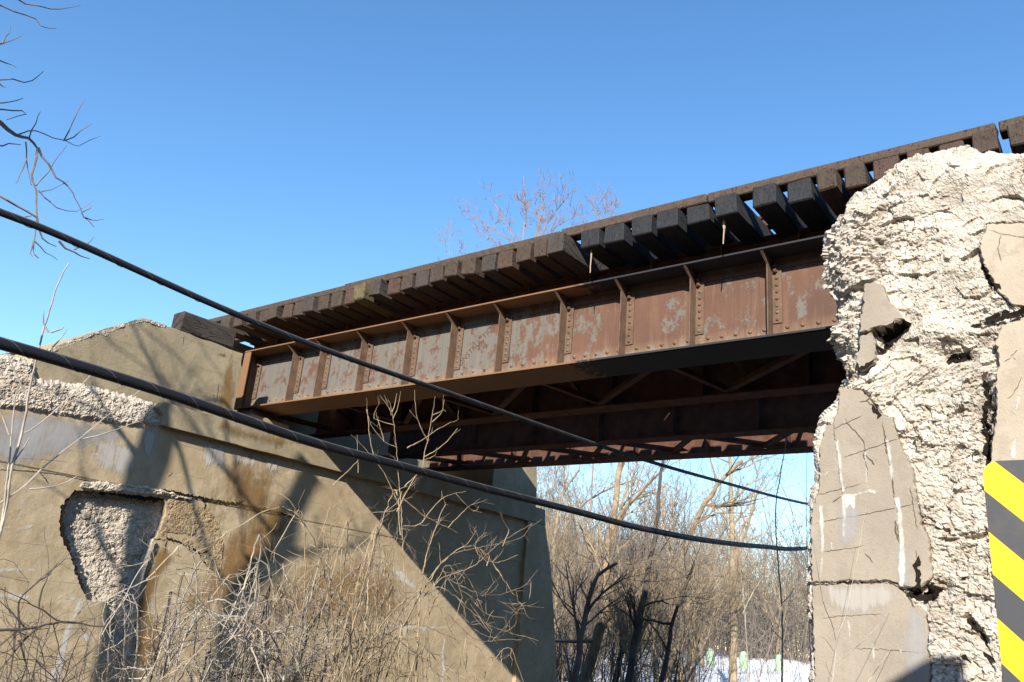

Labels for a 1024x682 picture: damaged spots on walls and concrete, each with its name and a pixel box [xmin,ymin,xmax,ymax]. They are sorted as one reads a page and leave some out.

spalling [0,354,160,427]
spalling [60,481,224,663]
crack [813,396,968,607]
spalling [805,145,1024,682]